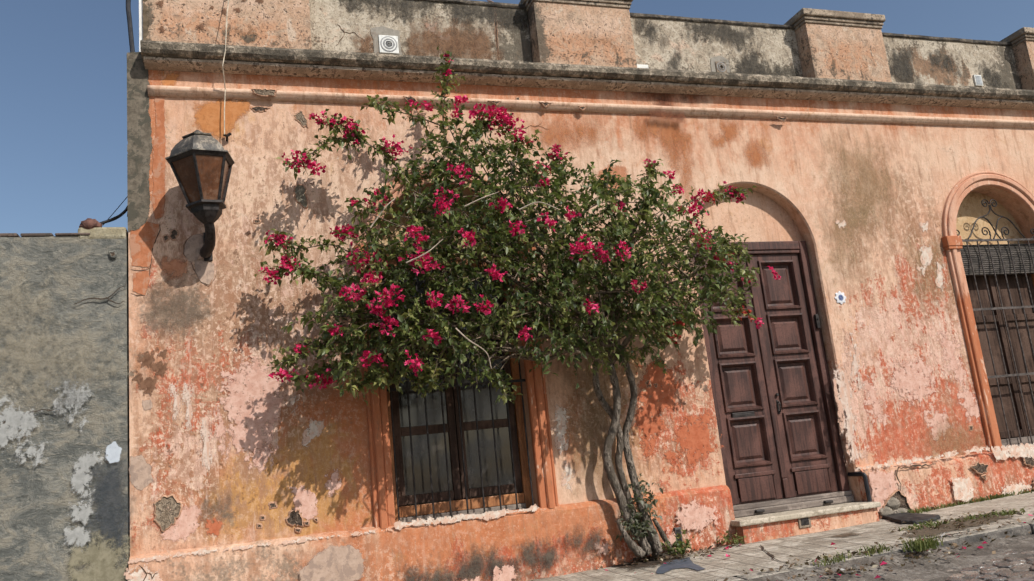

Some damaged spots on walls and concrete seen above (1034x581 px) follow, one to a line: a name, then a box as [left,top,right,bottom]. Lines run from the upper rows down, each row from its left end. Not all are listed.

water stain [347,0,528,60]
water stain [635,18,656,43]
water stain [667,53,681,70]
water stain [686,21,796,76]
peeling [193,99,270,138]
peeling [129,71,214,295]
peeling [129,347,300,474]
peeling [302,418,325,450]
peeling [551,405,576,492]
peeling [833,329,1034,519]
peeling [64,441,546,581]